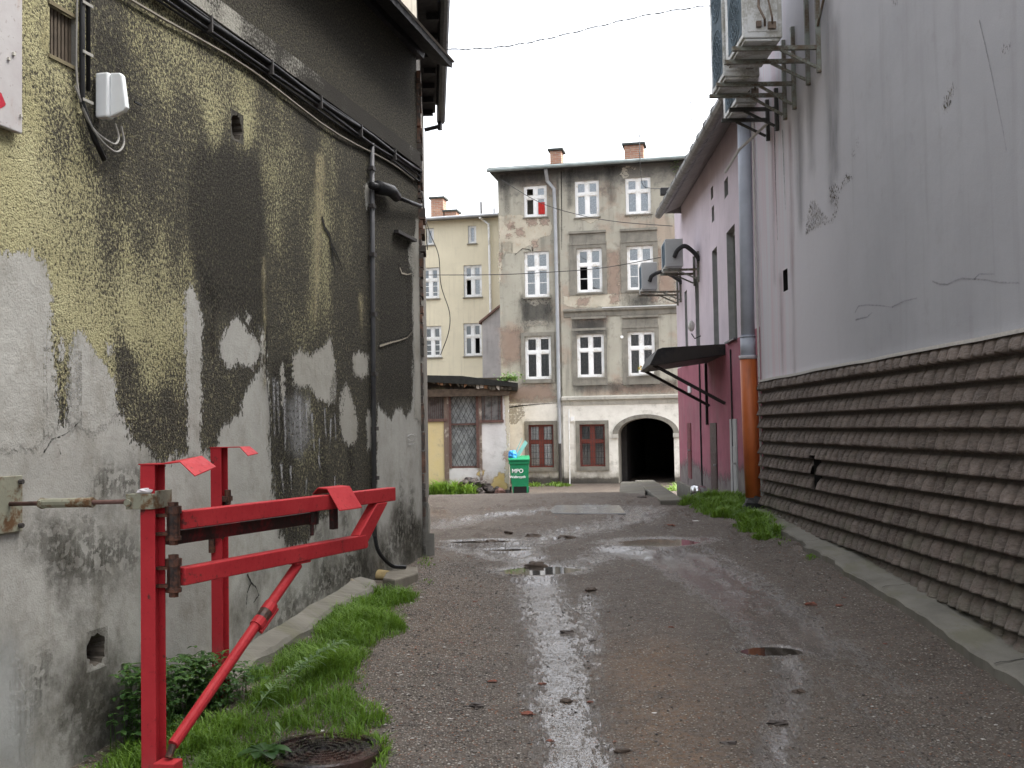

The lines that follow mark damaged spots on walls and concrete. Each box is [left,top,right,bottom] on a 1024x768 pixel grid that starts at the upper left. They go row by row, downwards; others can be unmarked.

damp [315,156,324,283]
peeling [498,214,553,283]
peeling [0,247,120,457]
peeling [182,285,206,458]
peeling [218,310,266,382]
damp [273,383,331,449]
peeling [279,336,372,453]